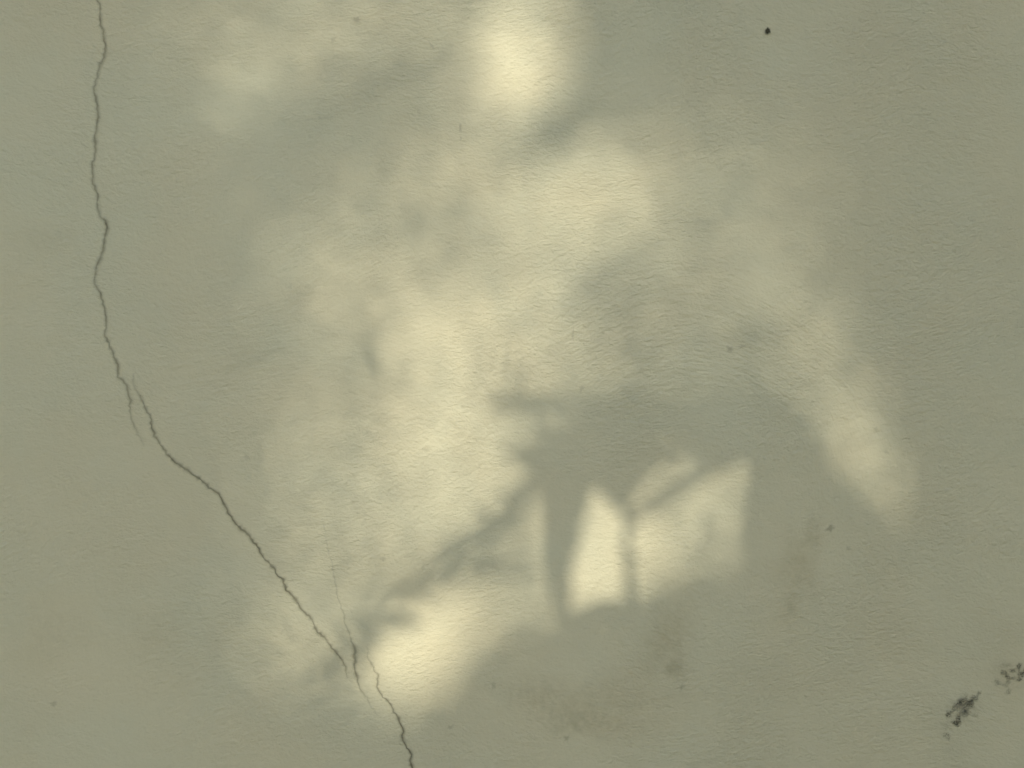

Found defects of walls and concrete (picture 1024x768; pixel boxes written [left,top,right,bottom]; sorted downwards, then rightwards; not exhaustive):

crack [169,456,292,595]
crack [398,717,413,768]